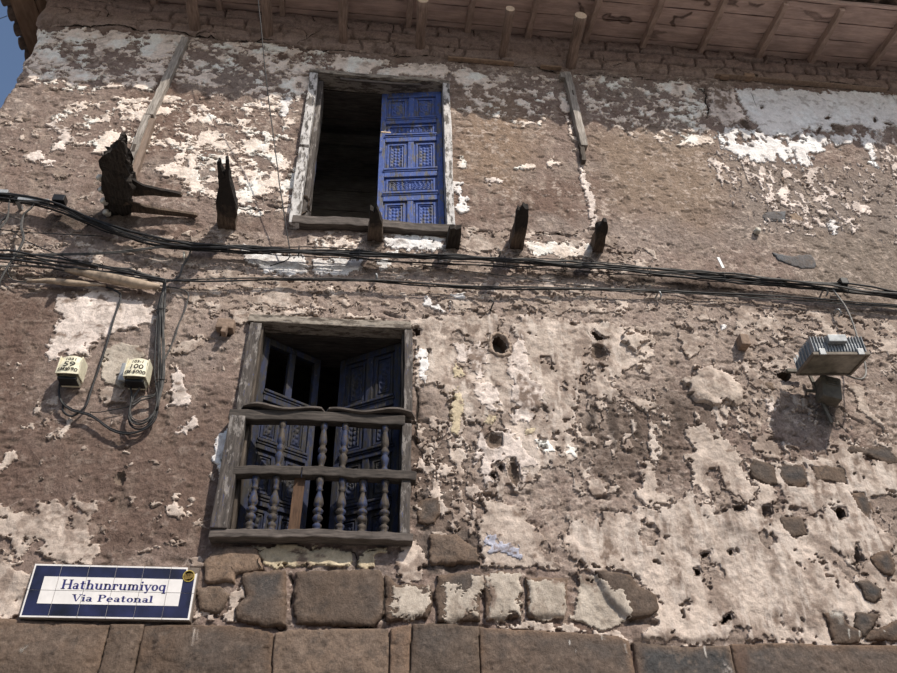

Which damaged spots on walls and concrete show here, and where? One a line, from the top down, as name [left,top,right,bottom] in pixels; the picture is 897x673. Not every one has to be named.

peeling [0,27,579,219]
peeling [573,75,897,237]
peeling [0,165,897,647]